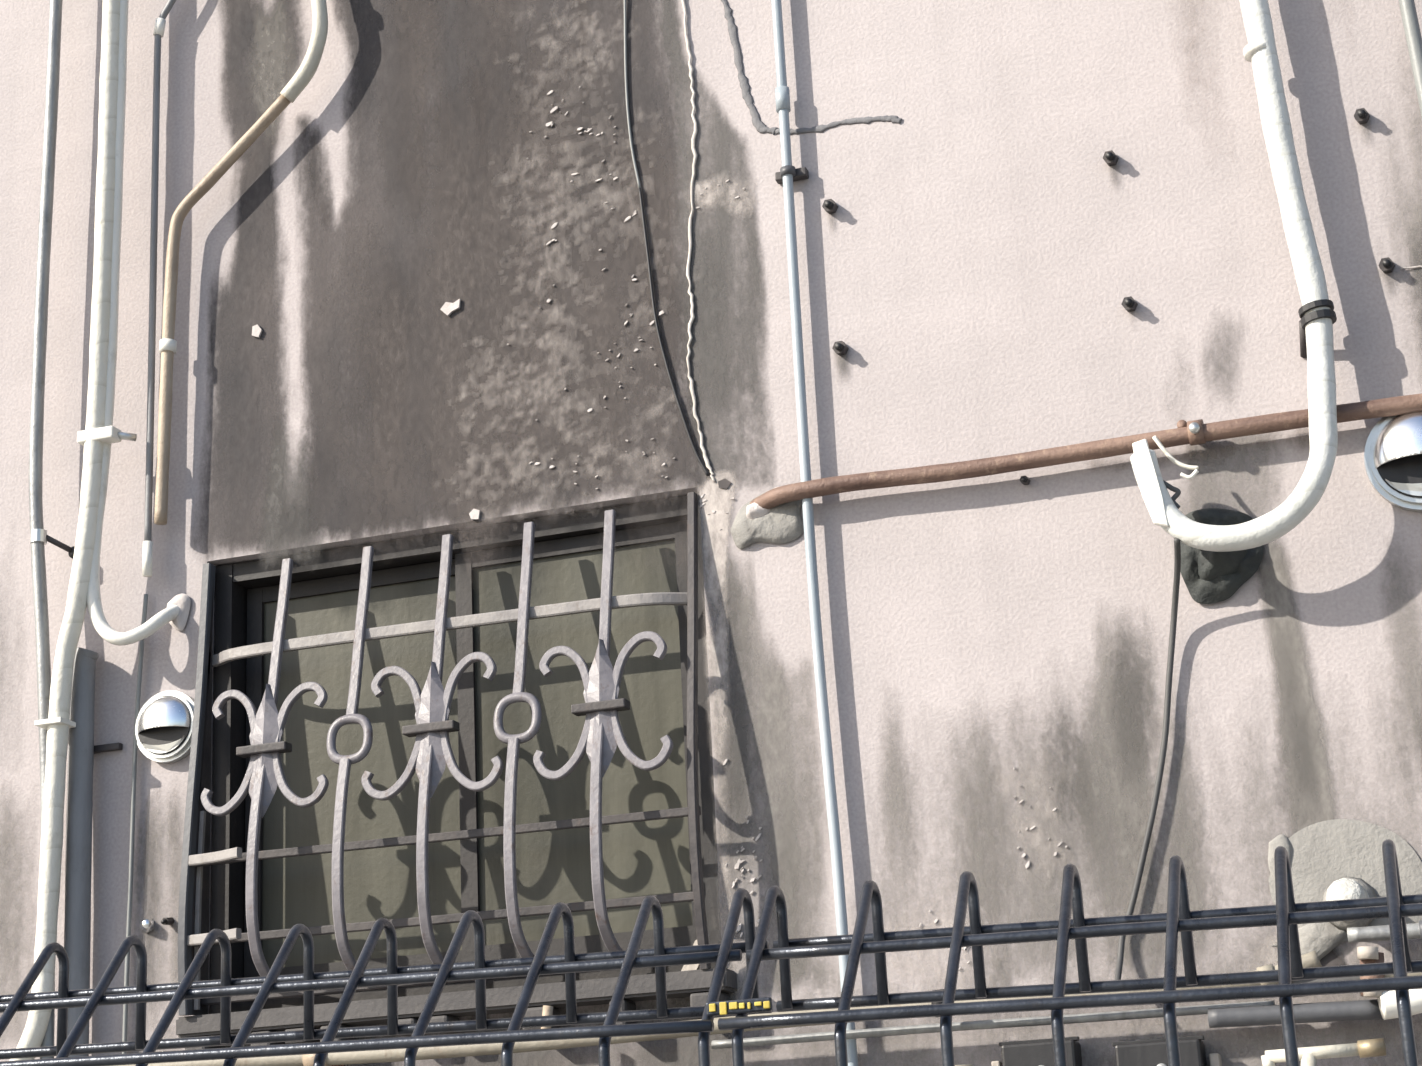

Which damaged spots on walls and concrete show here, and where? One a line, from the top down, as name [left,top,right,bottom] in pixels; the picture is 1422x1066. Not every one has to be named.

water stain [257,9,286,125]
peeling [530,86,584,138]
crack [721,0,902,135]
crack [681,0,715,482]
water stain [662,0,764,481]
peeling [588,310,665,412]
water stain [717,563,820,939]
water stain [1082,643,1204,916]
water stain [1258,541,1334,834]
water stain [772,958,824,990]
water stain [1114,930,1205,955]
water stain [1124,1004,1284,1066]